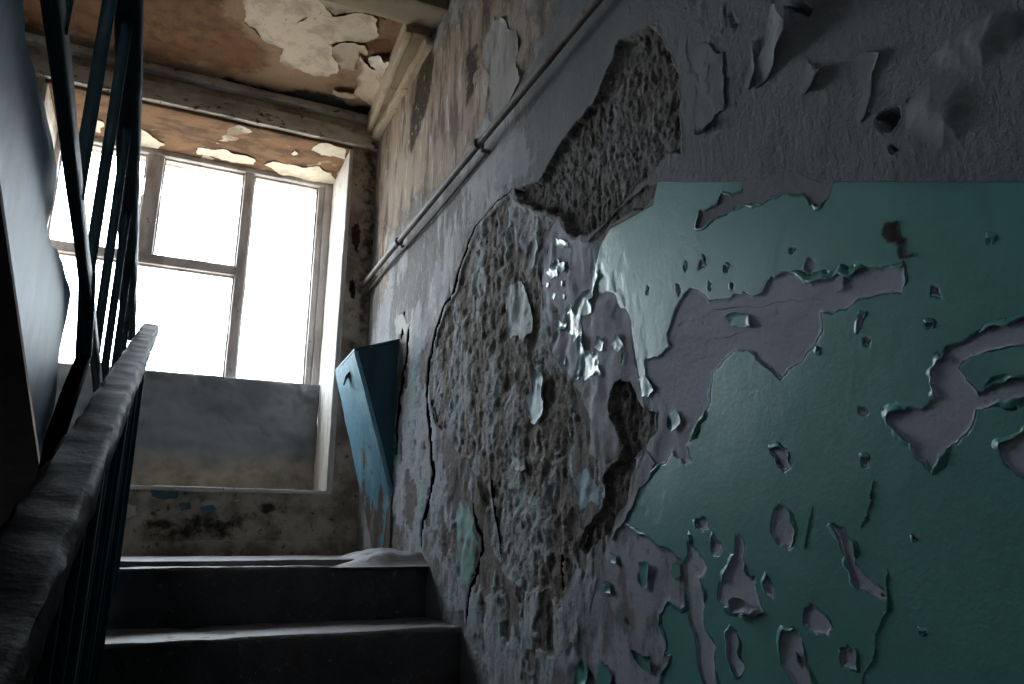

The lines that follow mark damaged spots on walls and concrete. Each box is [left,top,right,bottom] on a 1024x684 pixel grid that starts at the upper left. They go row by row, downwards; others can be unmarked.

peeling [242,0,389,107]
peeling [745,3,813,90]
peeling [141,129,165,149]
peeling [196,143,346,185]
crack [394,189,512,548]
flaking render [430,17,913,684]
peeling [881,313,1024,478]
leakage [147,514,240,538]
crack [466,471,502,621]